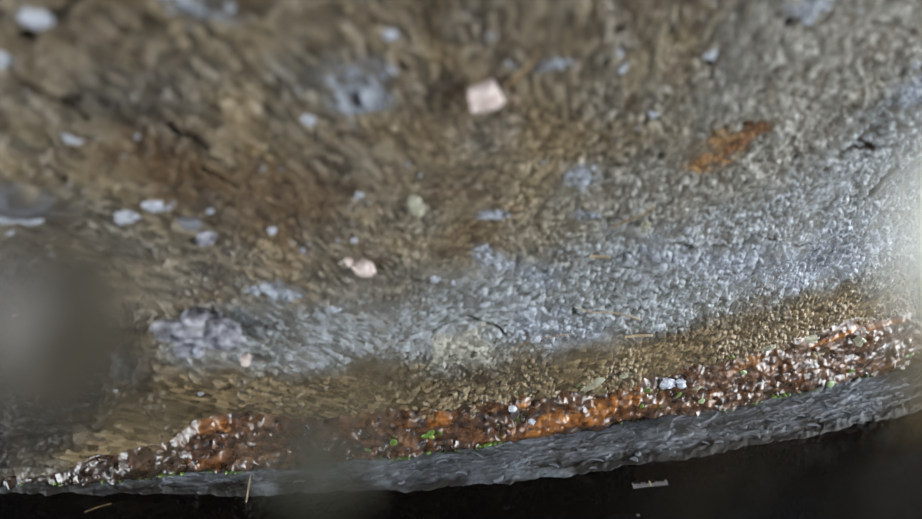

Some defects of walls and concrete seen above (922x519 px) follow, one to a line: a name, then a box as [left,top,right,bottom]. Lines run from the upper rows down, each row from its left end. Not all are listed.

corrosion [681,118,771,173]
corrosion [346,309,917,460]
corrosion [0,411,284,490]